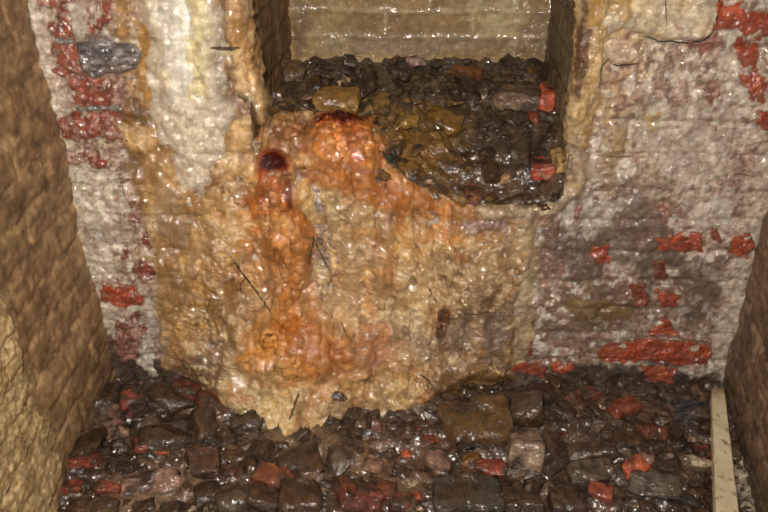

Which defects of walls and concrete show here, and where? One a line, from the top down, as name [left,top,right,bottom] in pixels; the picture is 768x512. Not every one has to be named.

leakage [68,7,97,42]
spalling [37,0,141,169]
leakage [69,169,130,284]
crack [228,253,271,313]
corrosion [247,109,364,238]
leakage [107,0,724,436]
crack [600,59,639,80]
spalling [597,228,755,384]
leakage [639,30,748,191]
leakage [687,192,734,230]